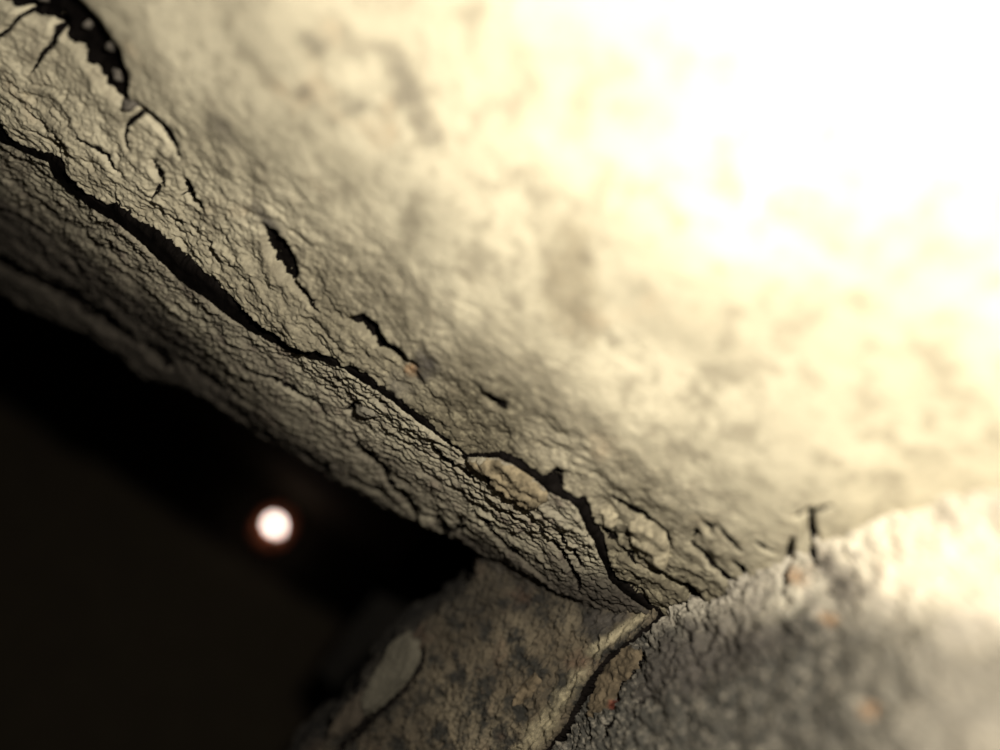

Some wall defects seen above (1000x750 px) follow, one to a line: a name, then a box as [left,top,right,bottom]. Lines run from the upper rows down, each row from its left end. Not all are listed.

crack [0,0,664,750]